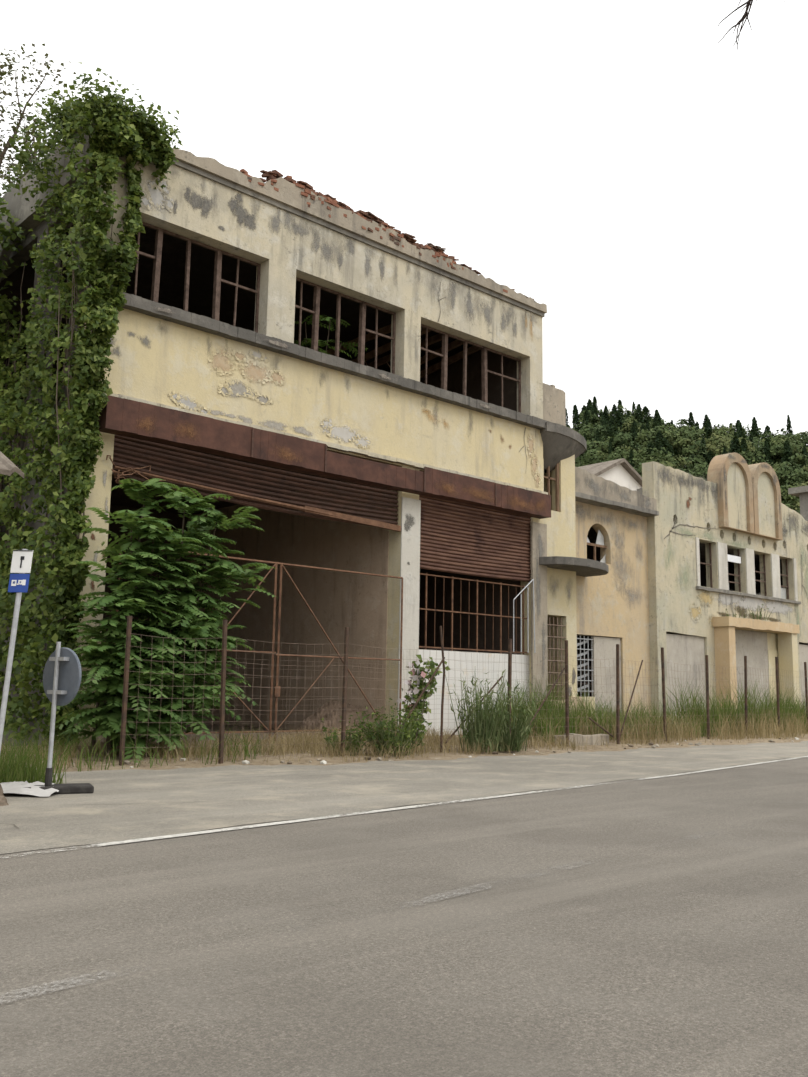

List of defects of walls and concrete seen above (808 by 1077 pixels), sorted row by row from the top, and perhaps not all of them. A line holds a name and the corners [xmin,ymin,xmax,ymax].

leakage [174,188,213,216]
leakage [228,193,256,230]
flaking render [240,169,464,270]
peeling [208,340,289,386]
peeling [167,391,211,415]
leakage [659,454,746,506]
leakage [718,593,800,627]